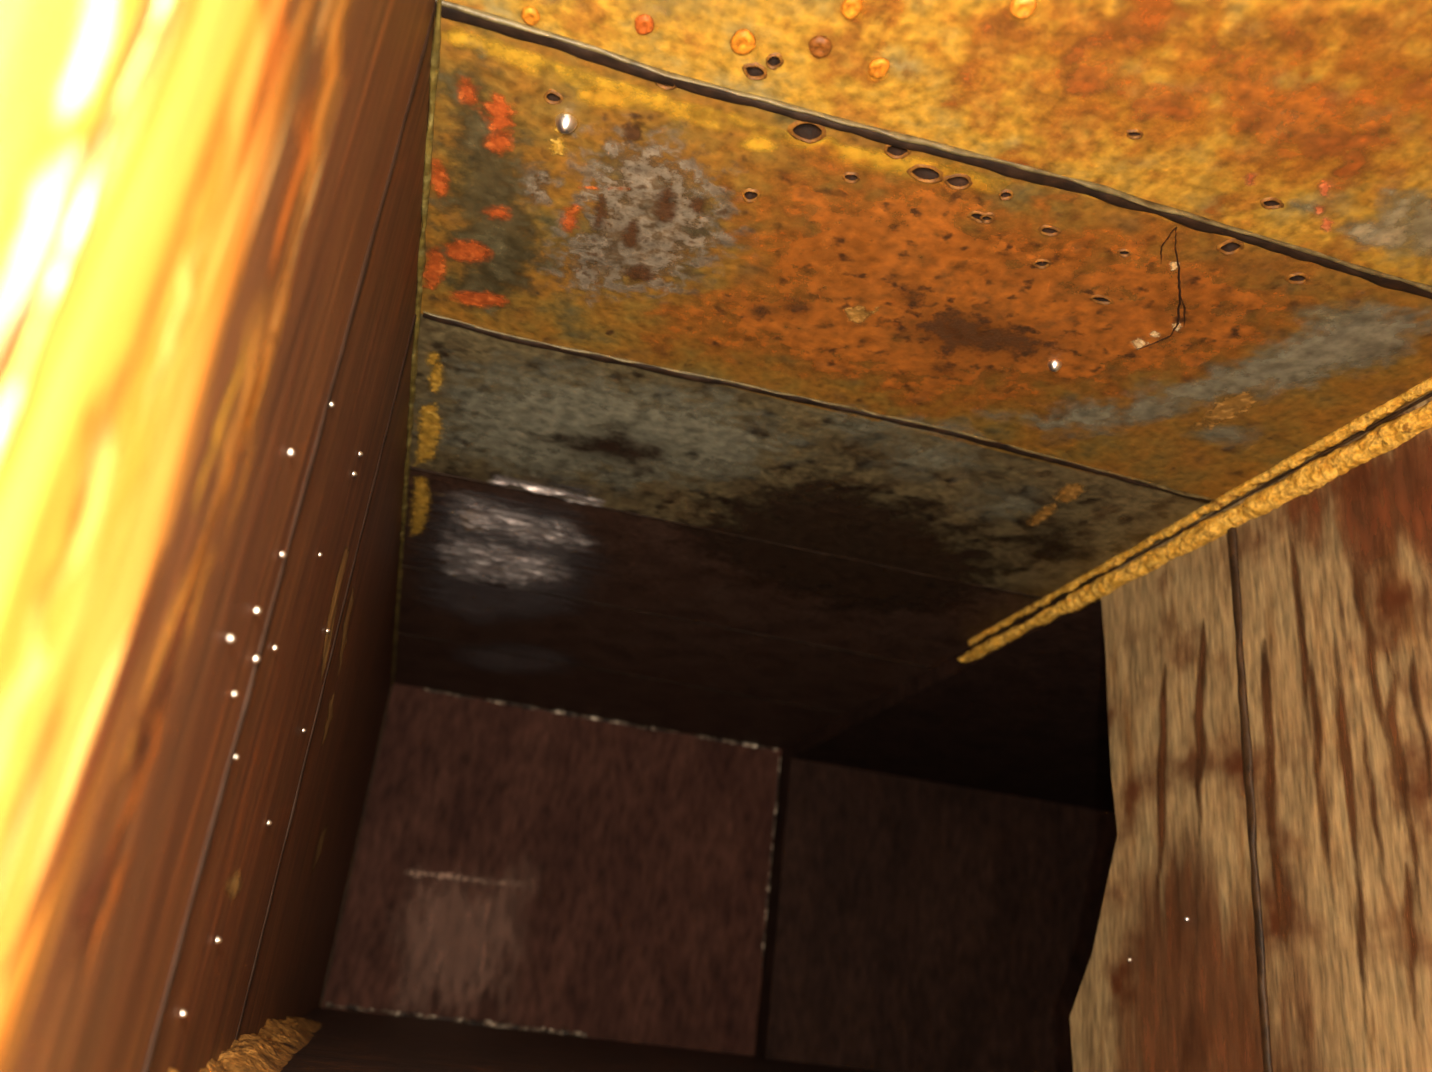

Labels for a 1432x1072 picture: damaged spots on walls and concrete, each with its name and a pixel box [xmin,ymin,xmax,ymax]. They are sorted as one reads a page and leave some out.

corrosion [635,14,654,35]
corrosion [841,0,863,20]
corrosion [809,35,832,58]
corrosion [448,32,710,140]
corrosion [459,81,515,154]
damp [548,126,565,155]
corrosion [431,160,448,196]
corrosion [423,240,490,290]
corrosion [627,264,654,281]
corrosion [644,137,1309,410]
corrosion [452,291,508,307]
corrosion [1029,483,1084,526]